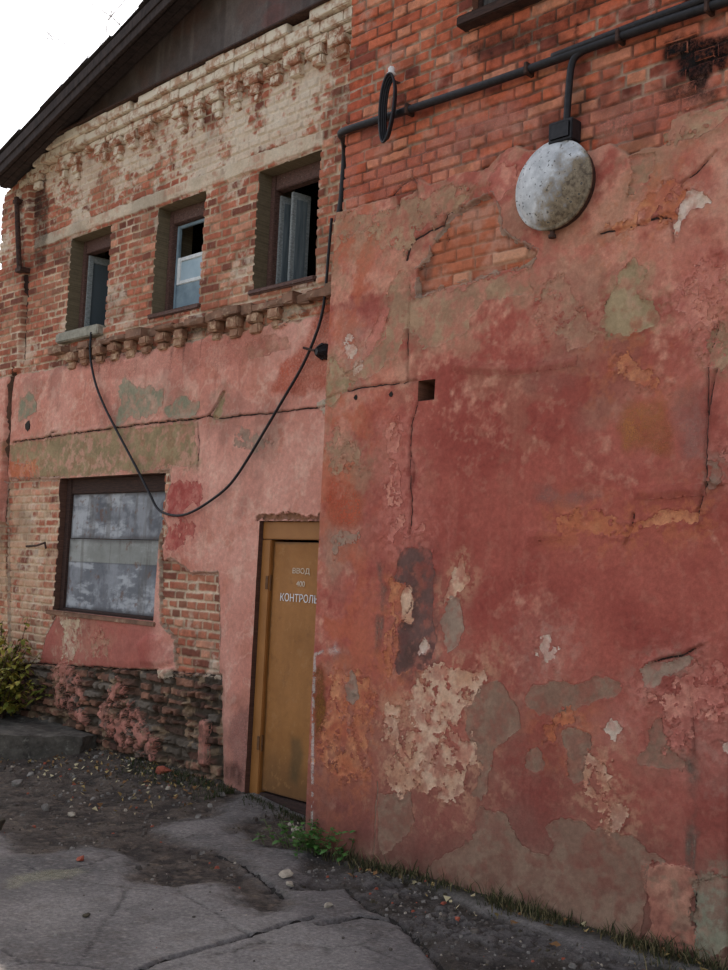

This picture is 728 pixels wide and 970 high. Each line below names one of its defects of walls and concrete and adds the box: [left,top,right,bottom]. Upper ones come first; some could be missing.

peeling [317,162,660,415]
spalling [4,377,222,680]
crack [14,405,325,461]
crack [348,382,408,392]
crack [410,405,418,529]
crack [699,326,719,513]
peeling [311,416,728,968]
crack [654,648,696,662]